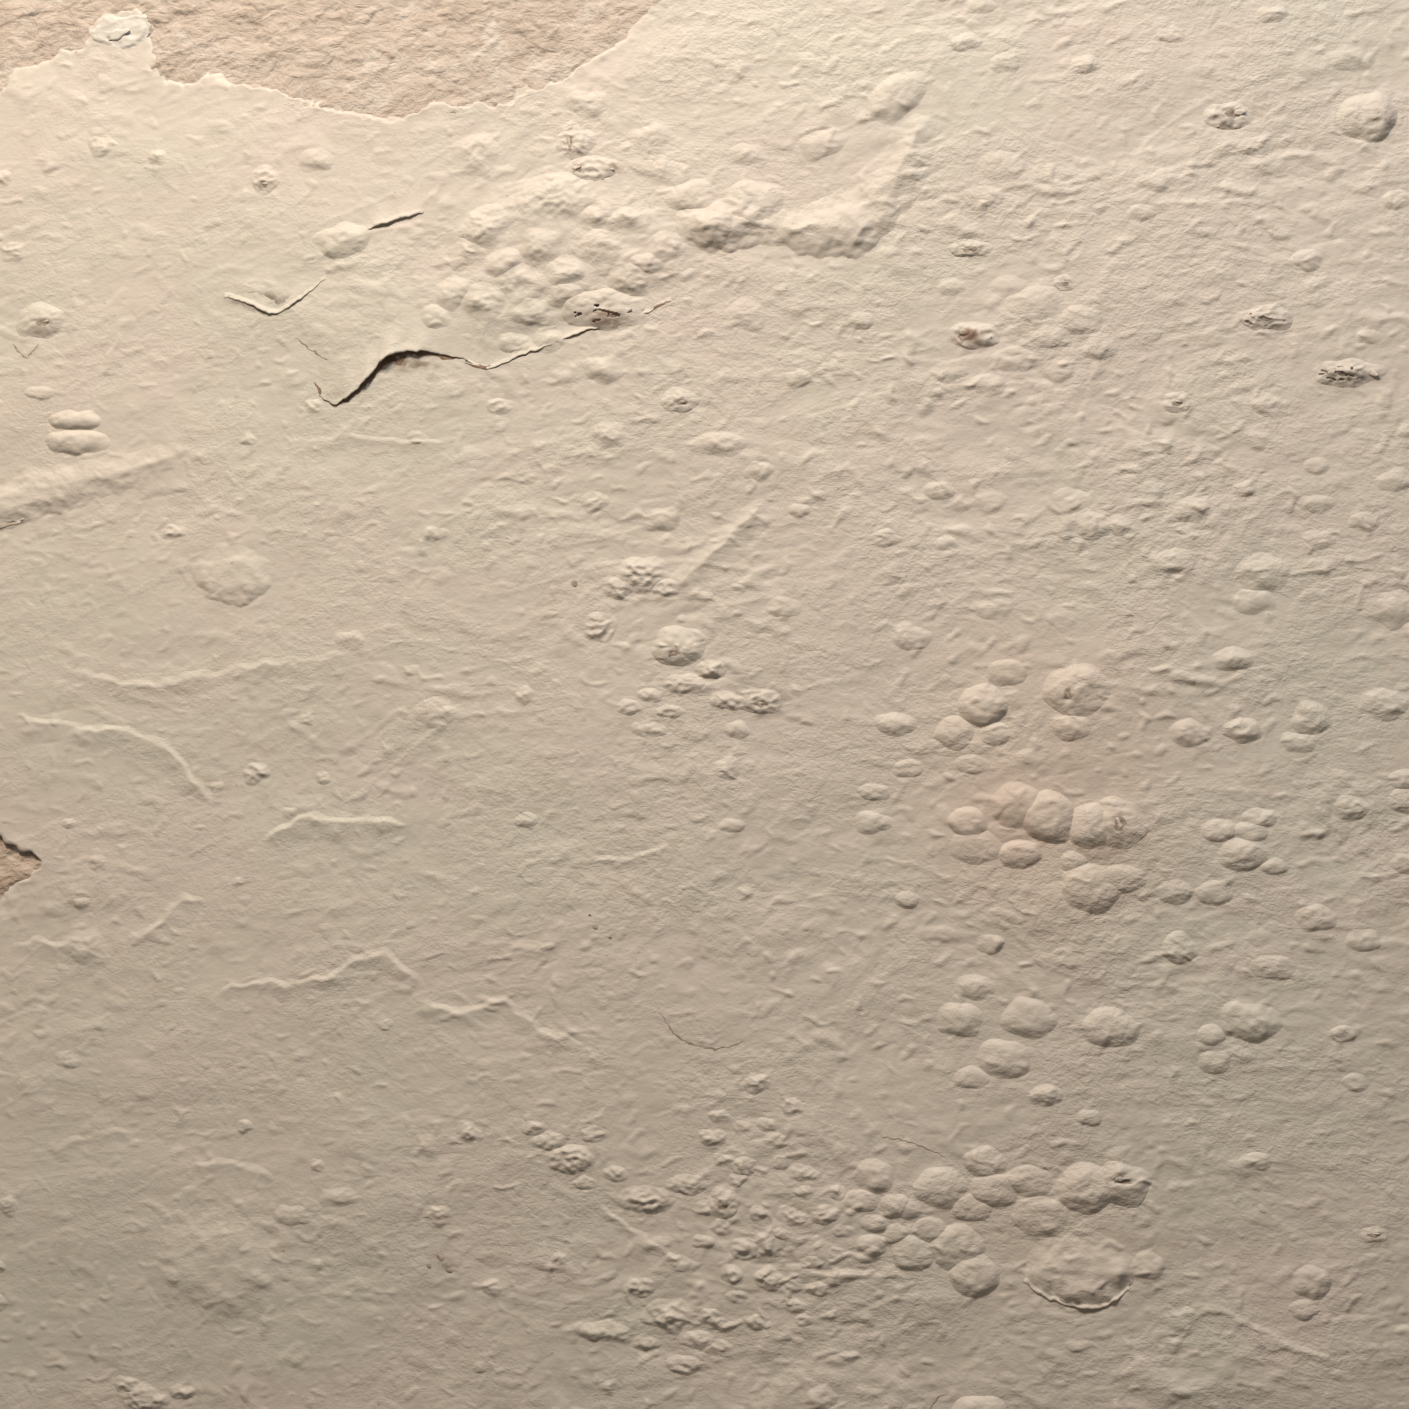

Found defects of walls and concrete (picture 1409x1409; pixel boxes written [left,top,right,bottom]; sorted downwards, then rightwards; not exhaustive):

peeling [0,0,661,135]
crack [297,338,328,360]
peeling [0,822,47,899]